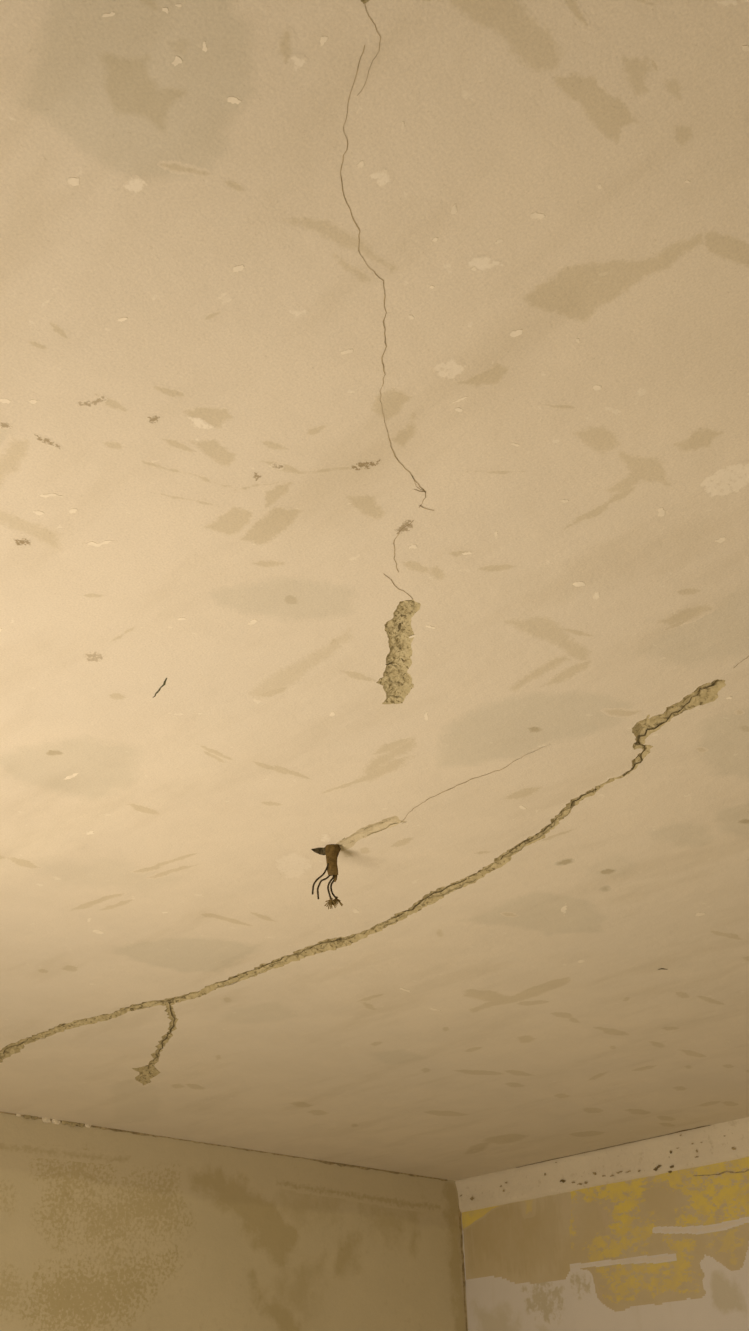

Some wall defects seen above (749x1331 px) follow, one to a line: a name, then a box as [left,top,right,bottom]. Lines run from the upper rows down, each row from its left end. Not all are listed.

crack [340,3,434,600]
flaking render [376,600,421,704]
crack [0,656,749,1086]
damp [0,1135,369,1331]
crack [0,1112,468,1331]
damp [438,1135,702,1331]
peeling [569,1157,749,1312]